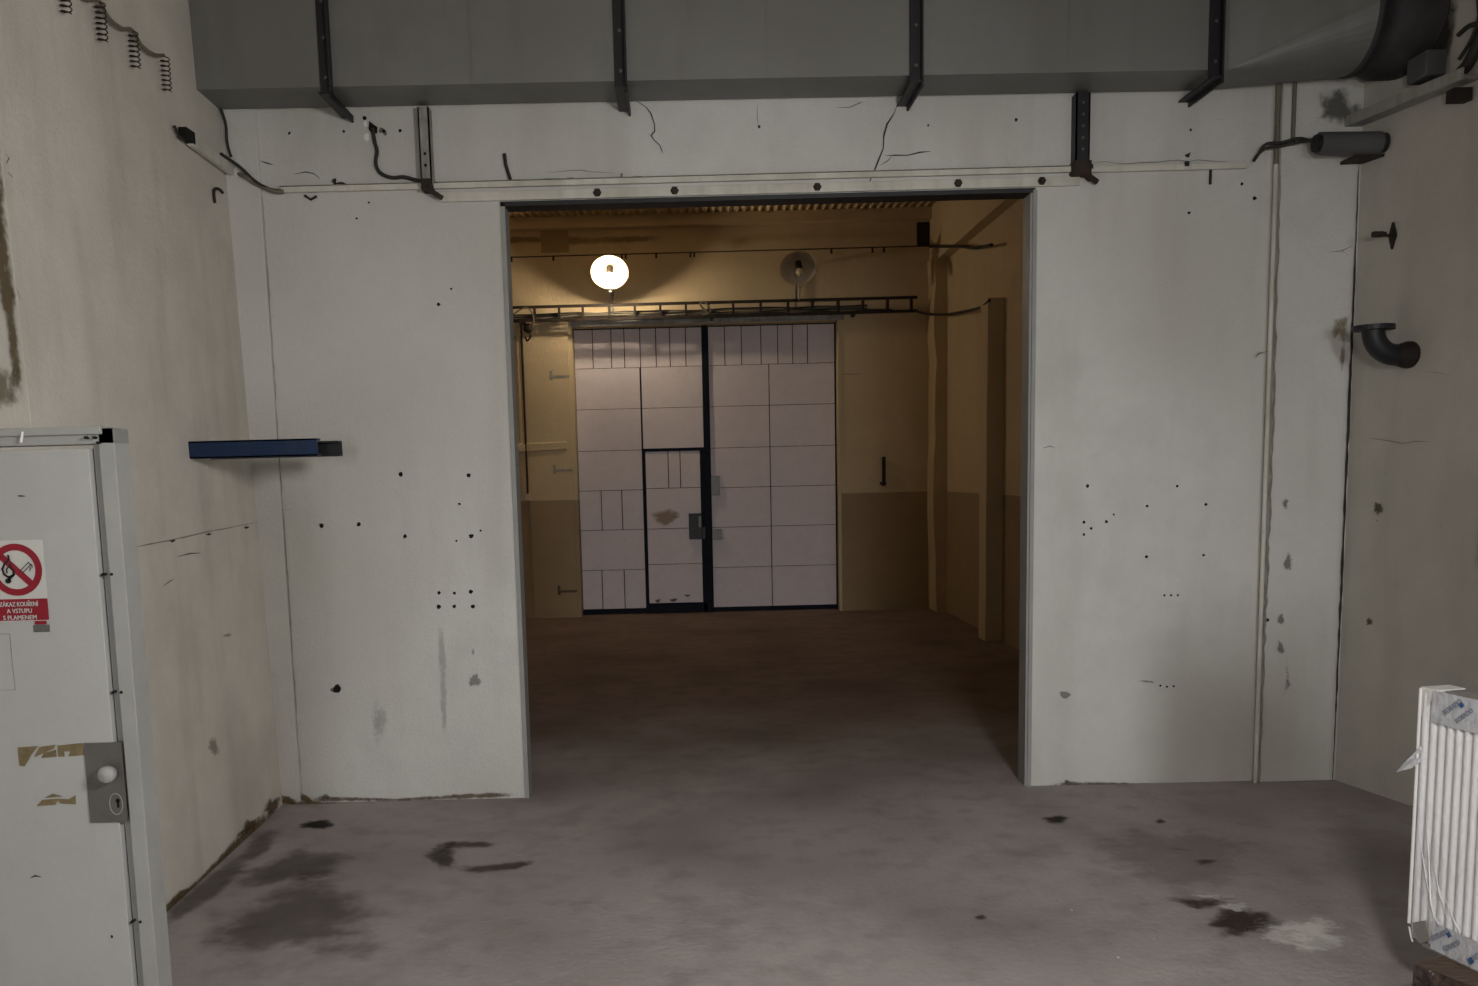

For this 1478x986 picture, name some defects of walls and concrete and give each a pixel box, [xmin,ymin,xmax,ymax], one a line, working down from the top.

crack [637,101,663,153]
crack [837,102,930,181]
crack [513,170,634,180]
water stain [0,178,21,400]
water stain [166,793,505,912]
water stain [470,862,527,872]
water stain [1181,894,1251,912]
water stain [1260,917,1346,953]